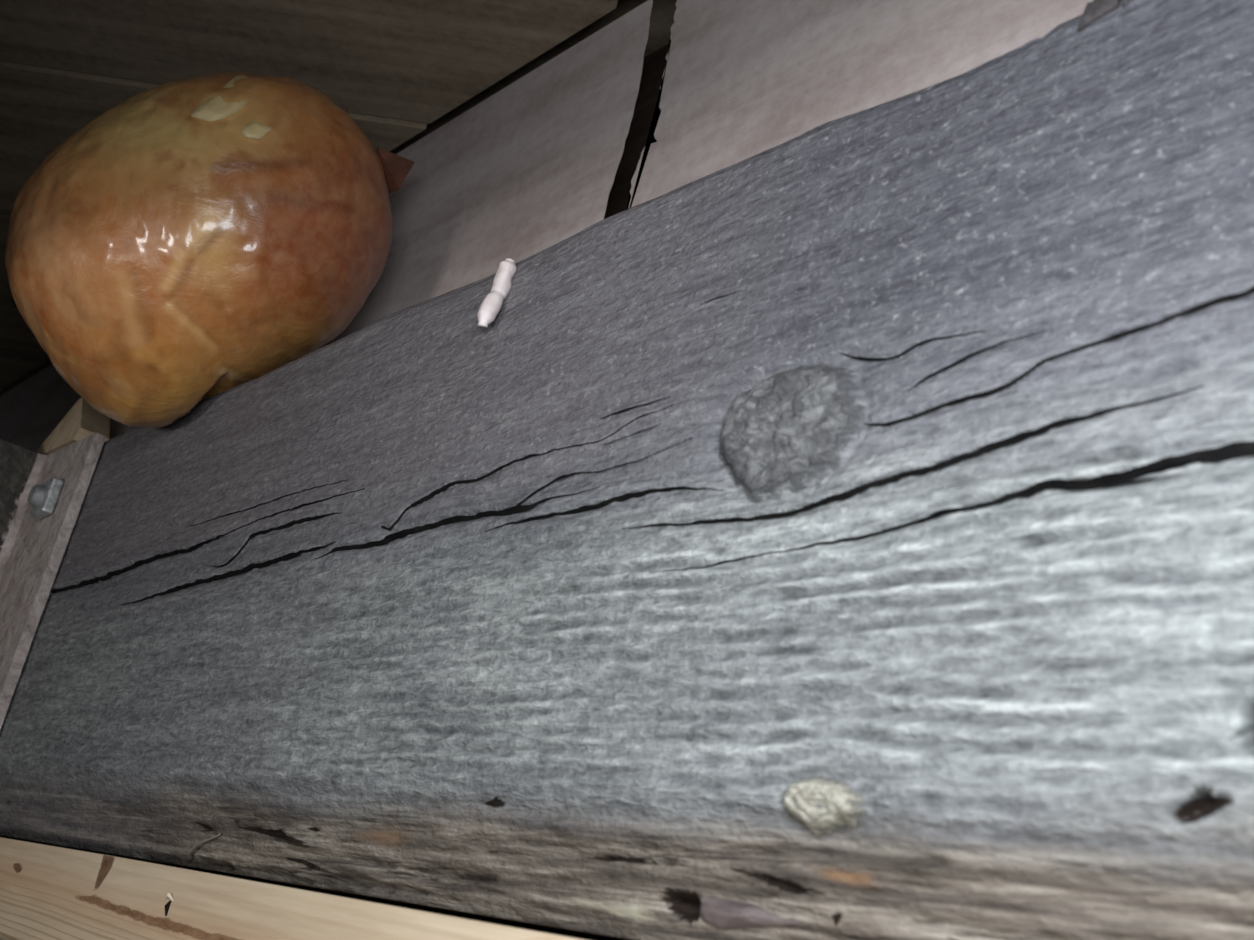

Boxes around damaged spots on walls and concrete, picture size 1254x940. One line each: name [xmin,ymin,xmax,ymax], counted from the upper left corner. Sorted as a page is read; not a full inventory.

crack [838,287,1254,426]
crack [50,385,1254,605]